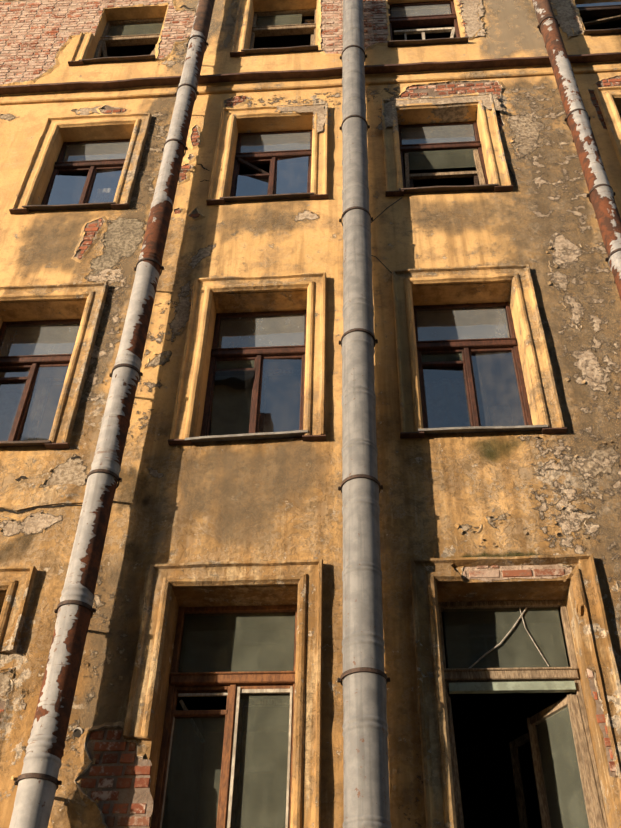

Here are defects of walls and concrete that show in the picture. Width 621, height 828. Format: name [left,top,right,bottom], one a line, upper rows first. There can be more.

flaking render [0,0,196,86]
damp [480,0,547,59]
peeling [366,74,621,602]
peeling [39,454,88,488]
peeling [0,510,63,537]
flaking render [0,667,27,761]
flaking render [587,665,618,779]
flaking render [65,719,153,828]